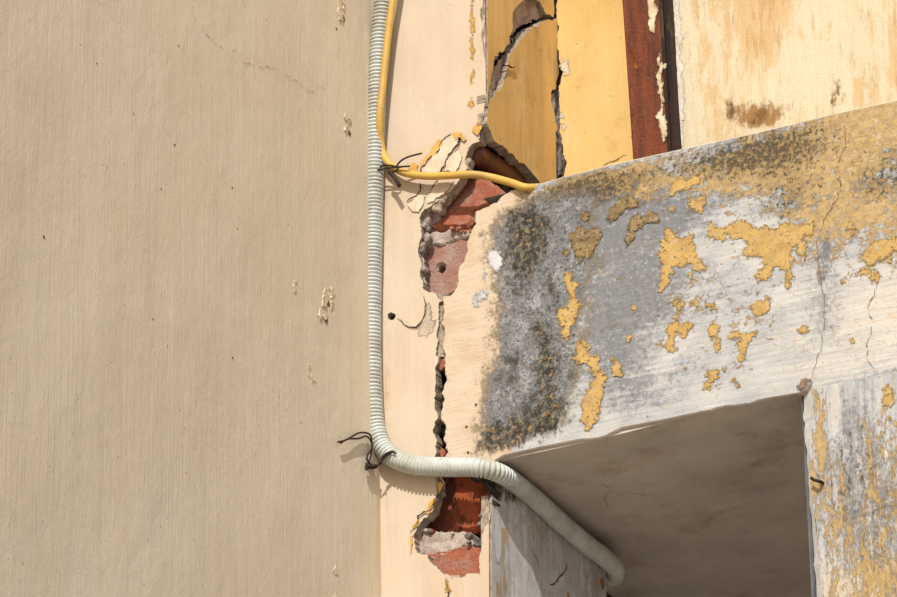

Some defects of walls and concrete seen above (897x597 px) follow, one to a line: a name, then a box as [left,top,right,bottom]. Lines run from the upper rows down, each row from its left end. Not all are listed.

crack [503,18,543,68]
crack [551,49,566,178]
peeling [647,0,658,33]
peeling [656,0,686,146]
crack [434,292,449,457]
leakage [473,185,603,456]
peeling [555,194,709,431]
peeling [661,297,774,390]
peeling [668,175,815,317]
crack [810,117,847,379]
crack [866,280,878,369]
spalling [410,476,501,579]